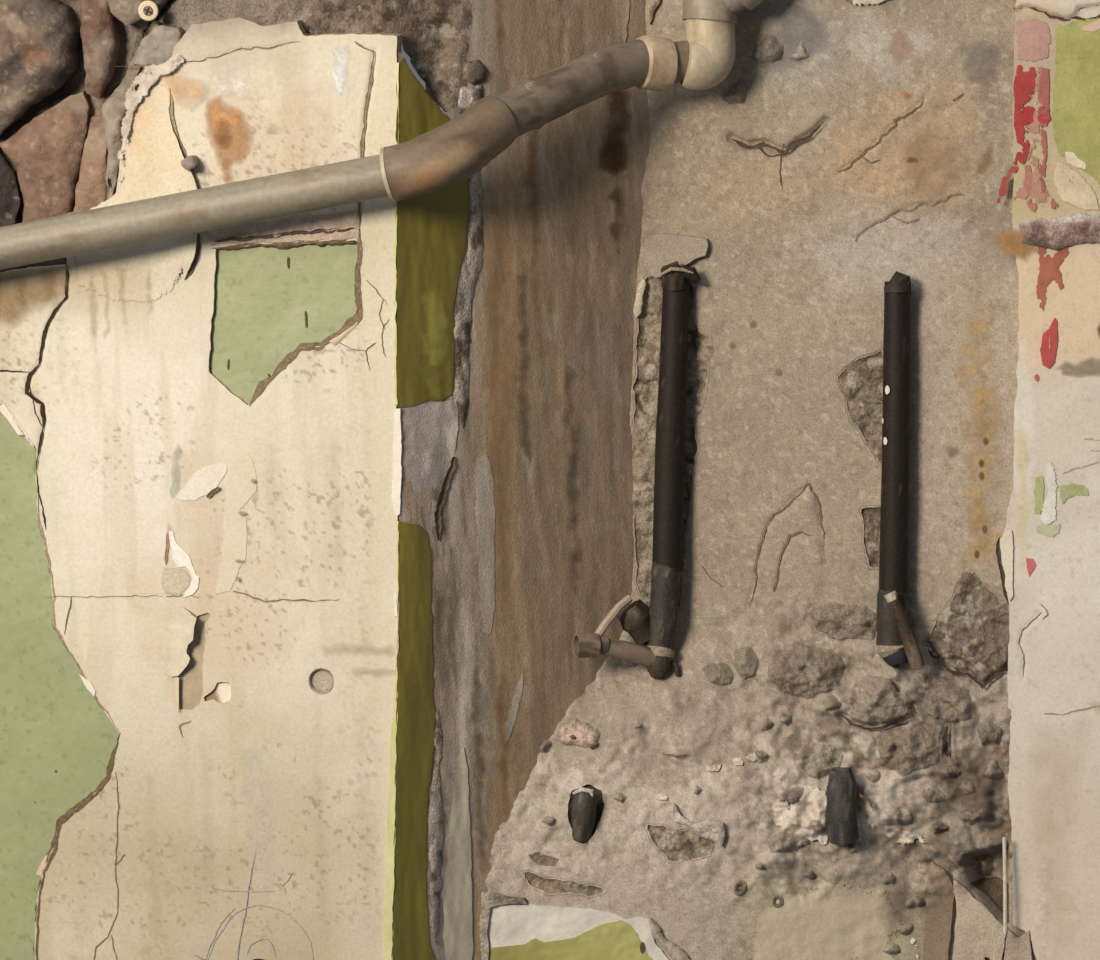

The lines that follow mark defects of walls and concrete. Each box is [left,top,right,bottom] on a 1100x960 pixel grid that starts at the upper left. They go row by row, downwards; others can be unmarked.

corrosion [207,100,248,180]
crack [732,121,824,190]
crack [839,96,923,172]
crack [0,258,69,529]
peeling [74,211,362,406]
flaking render [631,276,663,607]
corrosion [962,319,997,562]
peeling [0,403,120,960]
crack [234,591,335,602]
peeling [383,171,484,960]
crack [748,483,826,608]
spalling [927,530,1014,685]